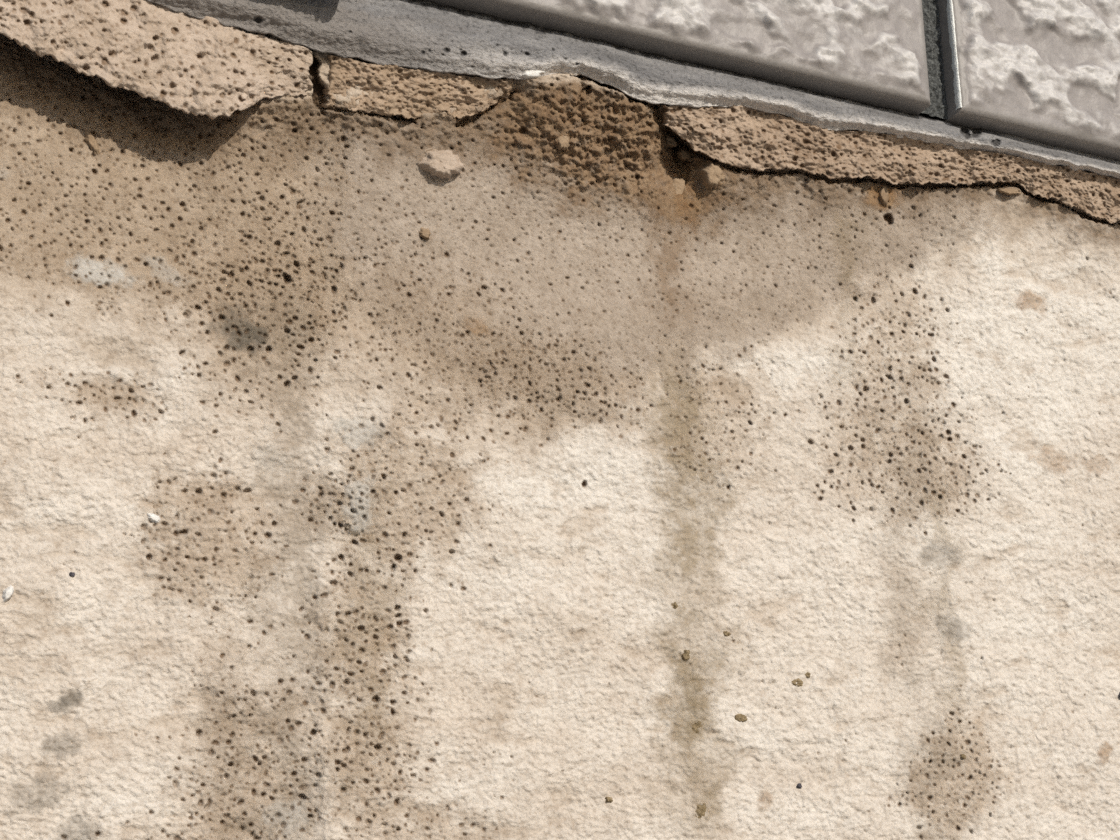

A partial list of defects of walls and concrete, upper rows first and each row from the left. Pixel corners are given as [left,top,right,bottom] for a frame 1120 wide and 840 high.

crack [309,57,422,128]
crack [455,92,513,127]
crack [576,75,661,122]
crack [674,151,1120,225]
water stain [75,259,132,284]